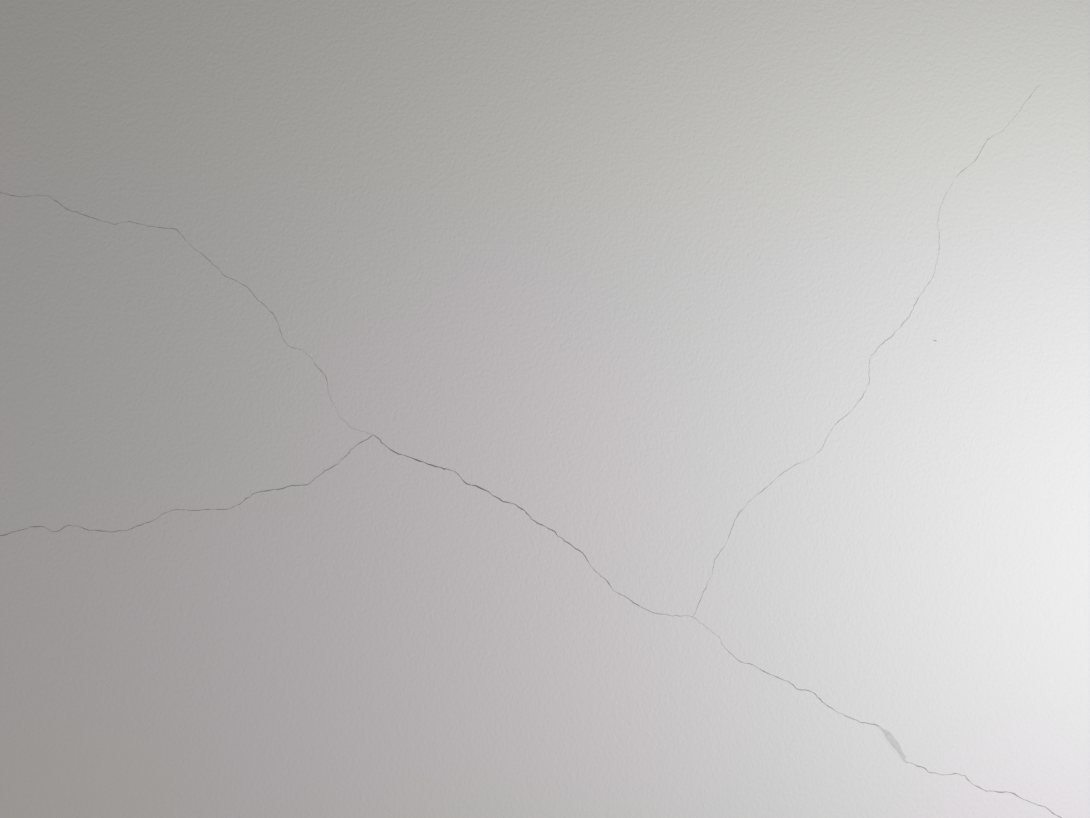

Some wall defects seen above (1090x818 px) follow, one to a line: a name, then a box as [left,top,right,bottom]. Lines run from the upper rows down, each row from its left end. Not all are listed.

crack [0,84,1041,729]
crack [872,724,1064,818]